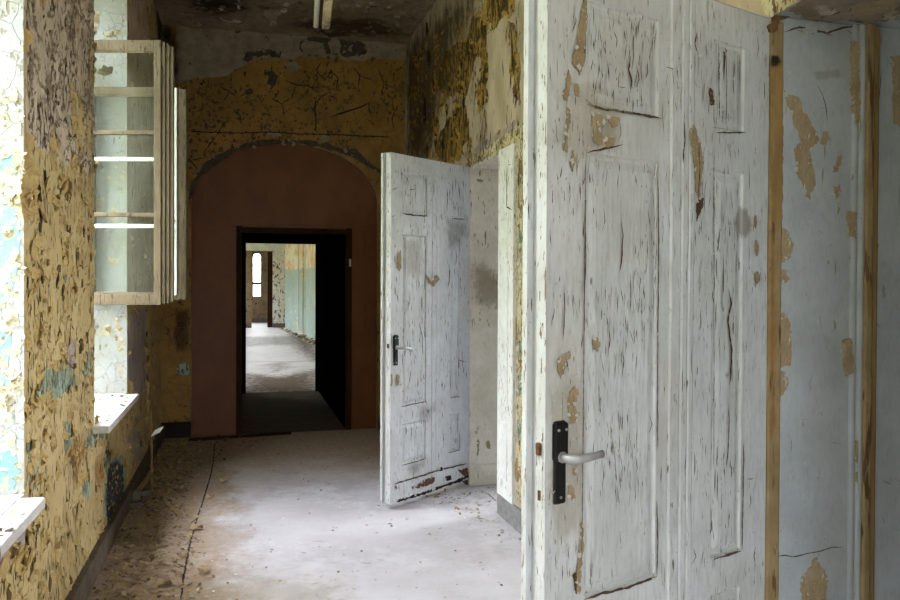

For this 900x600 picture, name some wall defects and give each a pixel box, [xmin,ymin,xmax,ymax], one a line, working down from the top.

peeling [560,0,621,235]
peeling [643,0,900,239]
flaking render [0,0,161,600]
flaking render [175,0,523,503]
crack [188,0,521,484]
peeling [842,337,854,377]
crack [180,443,227,599]
crack [781,547,841,557]
peeling [800,557,829,600]